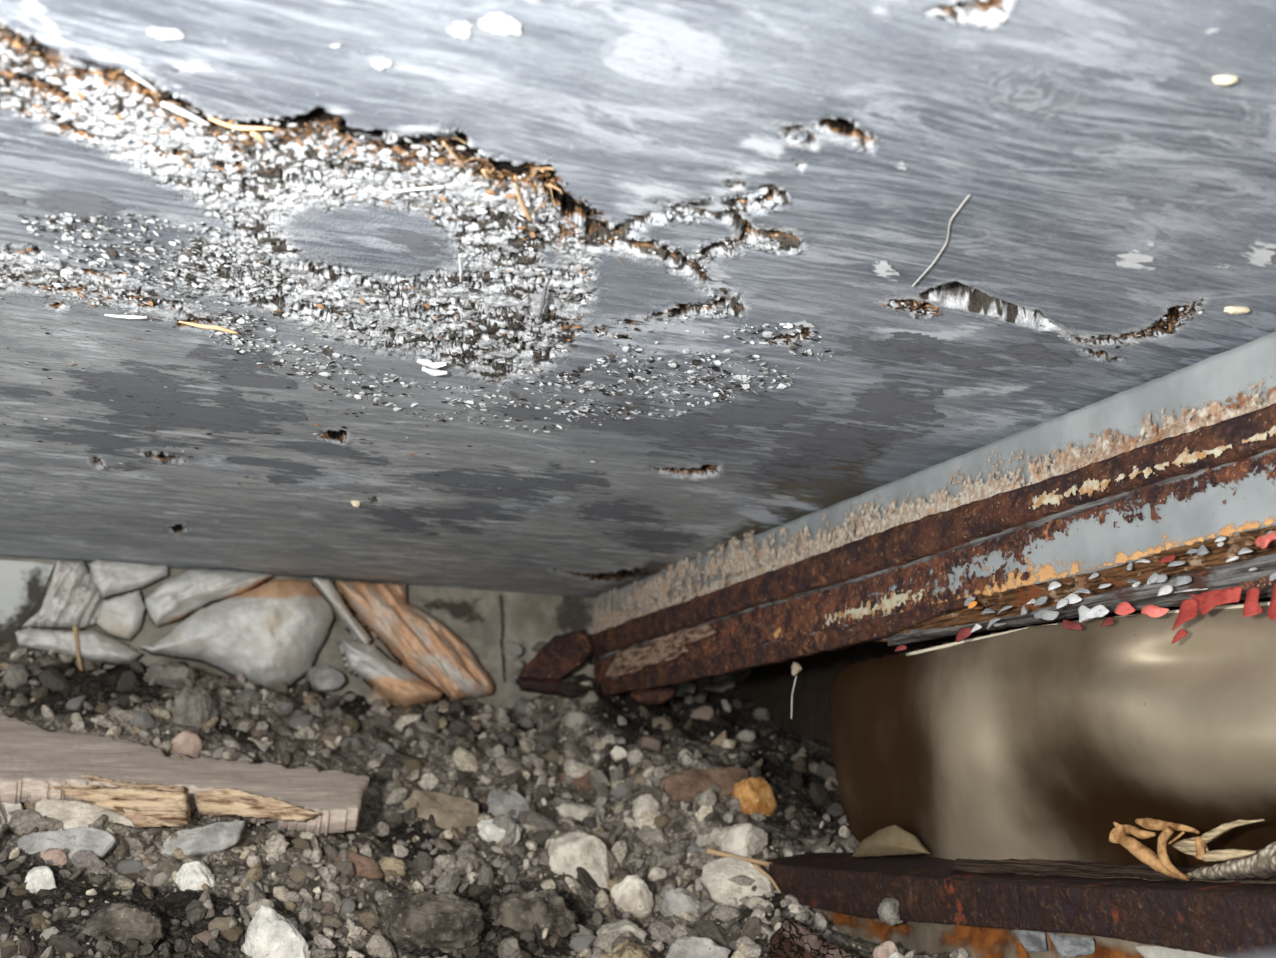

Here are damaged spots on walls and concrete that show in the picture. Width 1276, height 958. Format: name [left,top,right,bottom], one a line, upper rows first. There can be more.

spalling [0,13,834,472]
spalling [873,290,944,324]
spalling [1059,291,1216,366]
spalling [82,441,199,478]
rust [593,425,1276,696]
peeling [956,528,1276,644]
rust [832,913,912,942]
rust [941,925,1027,958]
rust [1087,945,1141,958]